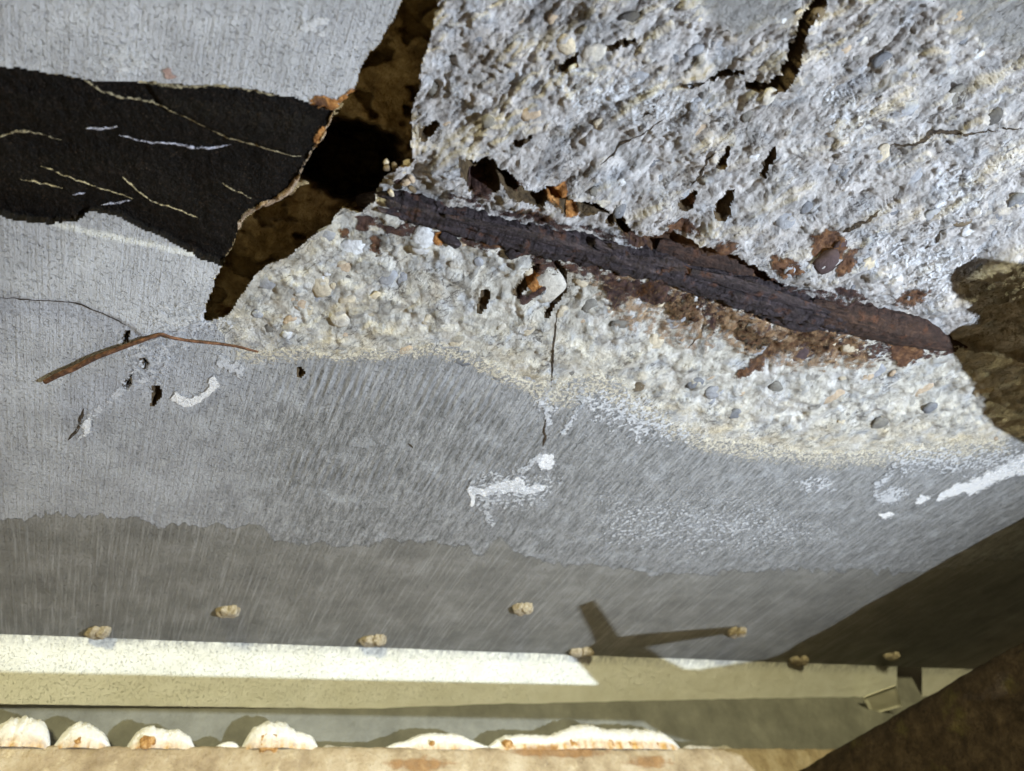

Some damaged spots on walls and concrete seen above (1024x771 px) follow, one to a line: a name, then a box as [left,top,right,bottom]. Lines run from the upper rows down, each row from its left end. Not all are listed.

crack [601,0,828,165]
spalling [216,0,1024,455]
rust [338,164,968,379]
damp [76,303,233,439]
crack [543,317,557,445]
damp [170,342,1024,519]
damp [0,453,1024,669]